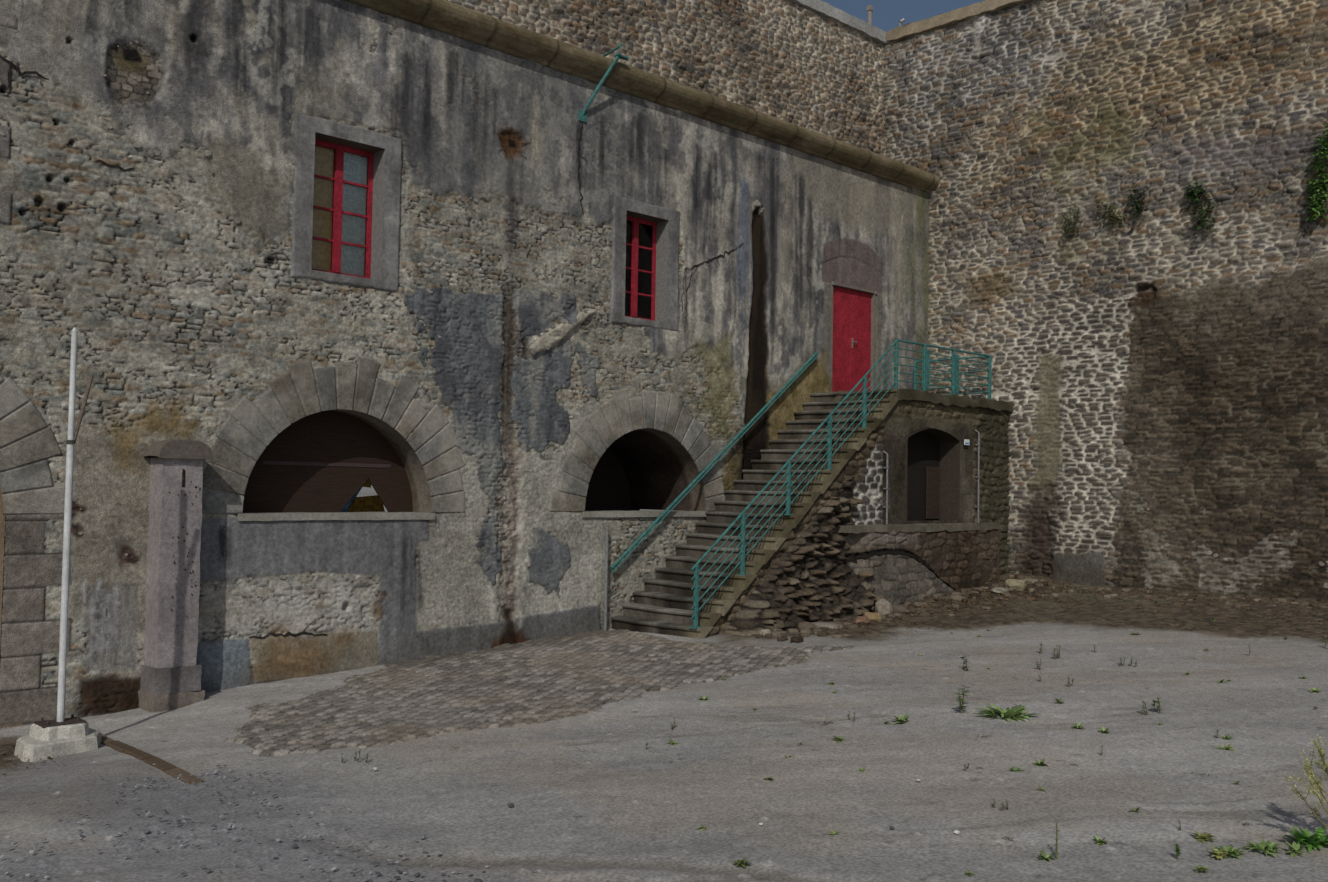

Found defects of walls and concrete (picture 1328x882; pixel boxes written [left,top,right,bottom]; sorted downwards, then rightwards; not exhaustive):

leakage [175,0,211,63]
crack [0,55,49,91]
spalling [103,40,163,106]
corrosion [496,122,531,162]
peeling [0,58,289,362]
crack [681,243,744,322]
leakage [737,159,775,480]
crack [249,621,327,639]
corrosion [492,608,527,648]